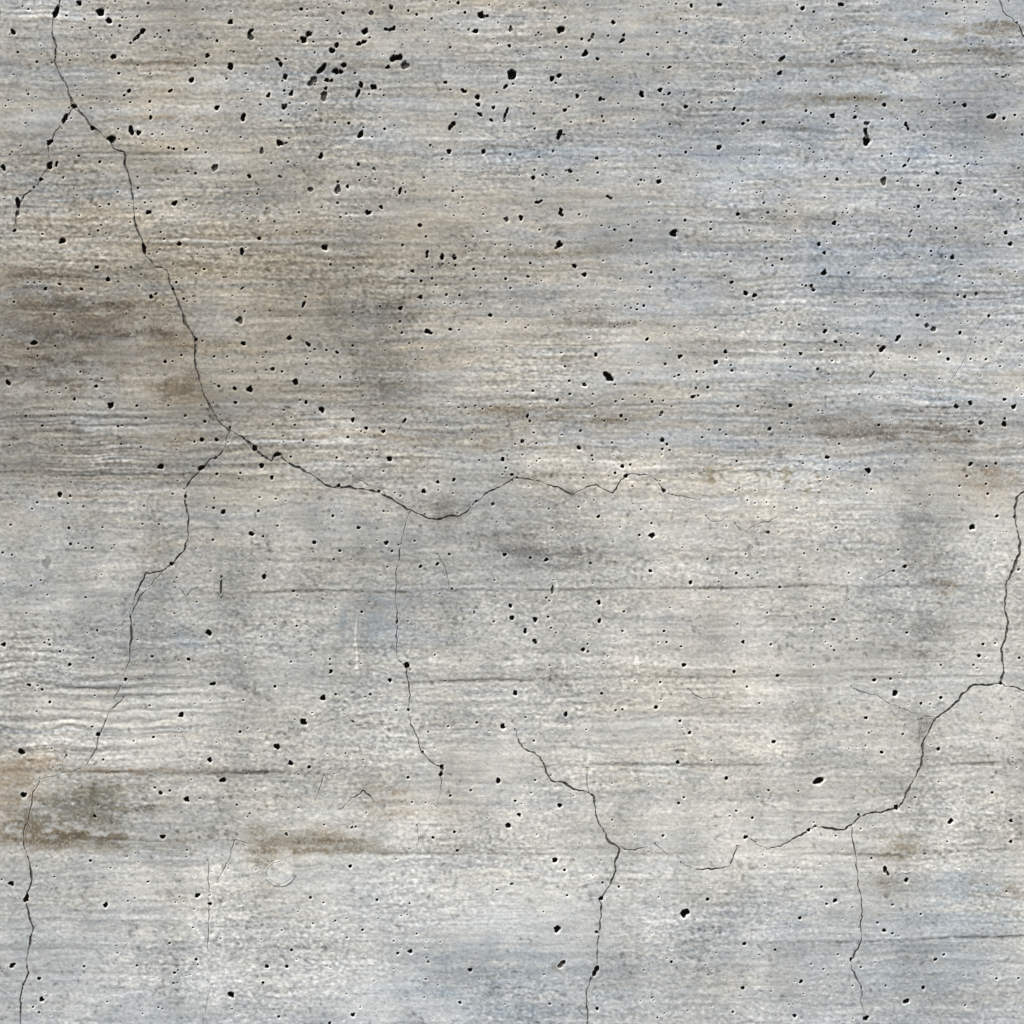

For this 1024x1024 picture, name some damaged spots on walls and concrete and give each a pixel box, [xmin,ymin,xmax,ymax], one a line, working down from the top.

crack [11,0,777,1024]